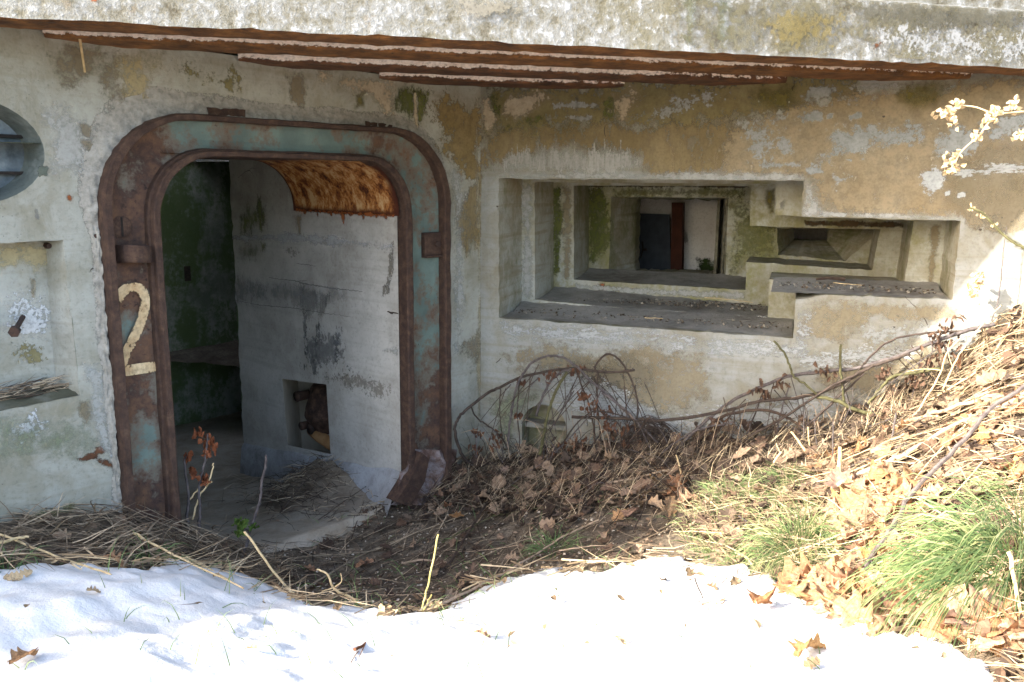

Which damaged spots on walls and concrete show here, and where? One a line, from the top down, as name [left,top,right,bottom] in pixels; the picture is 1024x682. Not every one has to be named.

corrosion [296,208,394,234]
leakage [41,30,1024,299]
peeling [736,85,1024,198]
corrosion [77,446,113,467]